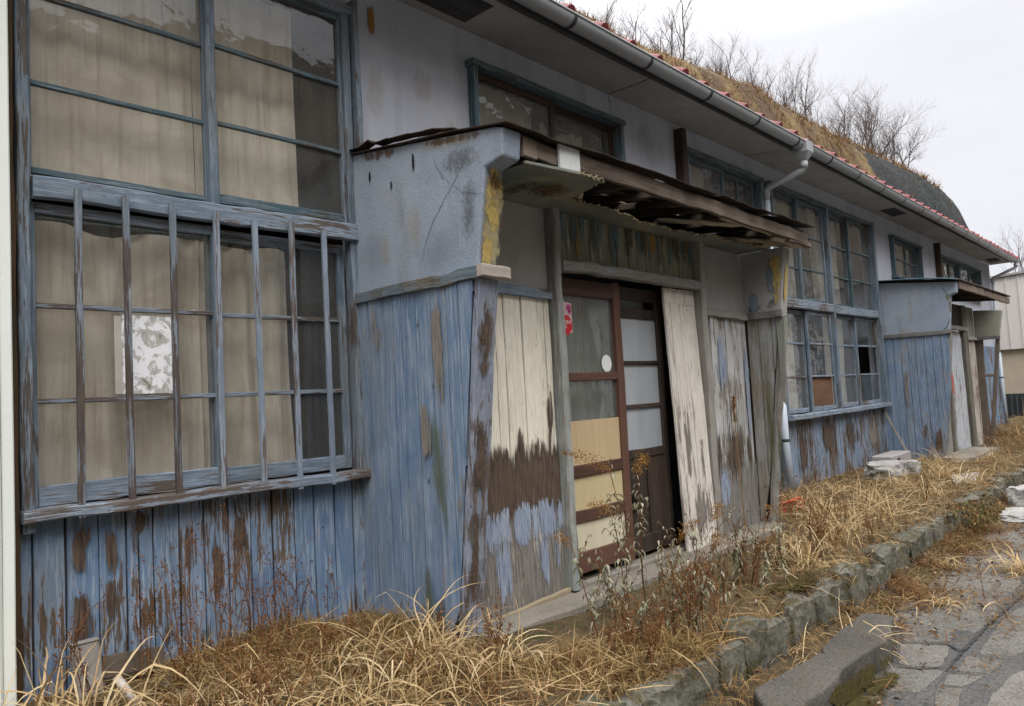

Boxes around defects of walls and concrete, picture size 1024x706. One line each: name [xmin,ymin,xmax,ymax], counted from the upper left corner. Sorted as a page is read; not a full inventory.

crack [421,154,482,262]
peeling [430,298,444,406]
peeling [480,308,492,378]
peeling [684,348,761,542]
peeling [795,415,882,477]
peeling [72,525,90,572]
peeling [74,592,94,641]
peeling [105,511,149,621]
peeling [212,516,248,600]
peeling [458,378,566,623]